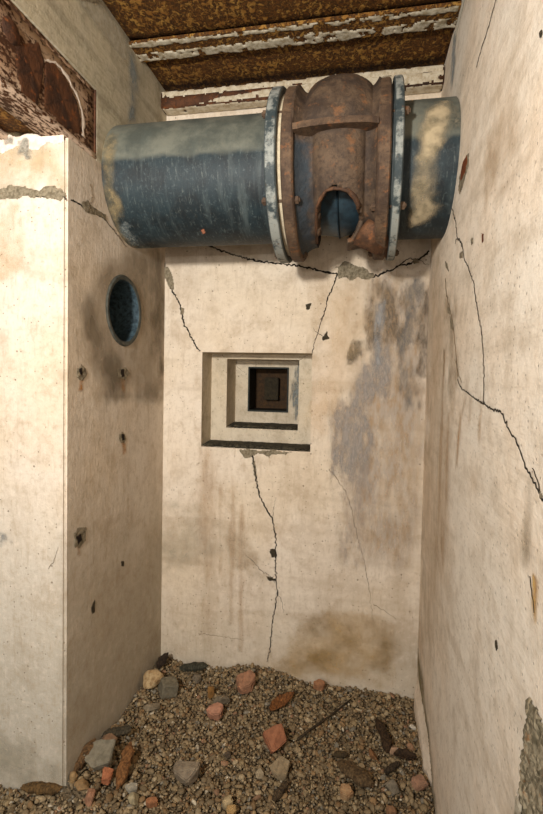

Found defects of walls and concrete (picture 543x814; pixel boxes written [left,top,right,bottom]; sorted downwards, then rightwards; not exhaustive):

rust [16,42,81,134]
crack [169,288,200,351]
crack [209,246,338,360]
damp [332,279,428,510]
crack [373,250,430,278]
crack [443,209,543,501]
crack [248,455,284,662]
spalling [514,697,543,814]